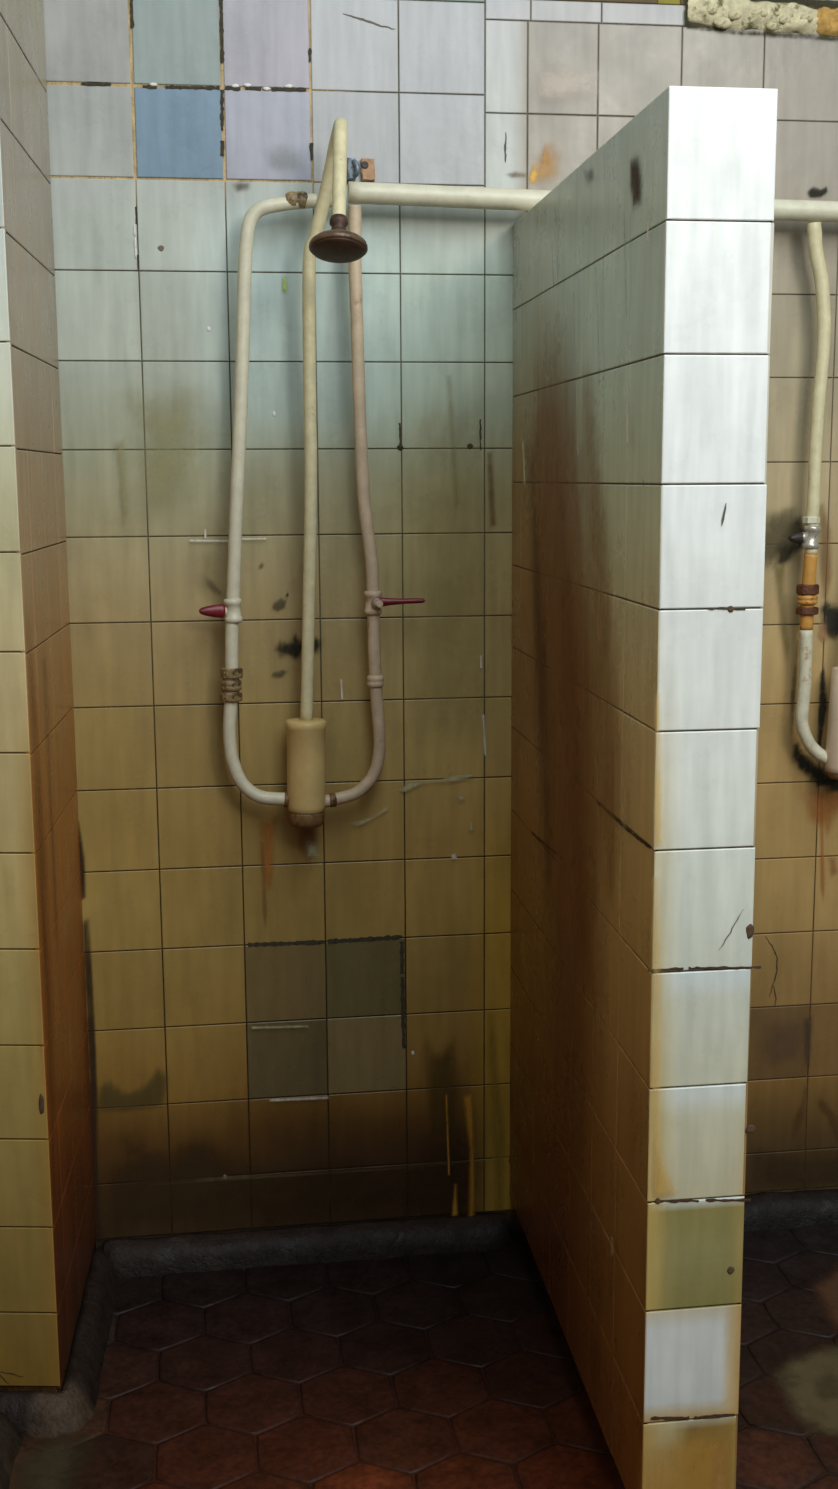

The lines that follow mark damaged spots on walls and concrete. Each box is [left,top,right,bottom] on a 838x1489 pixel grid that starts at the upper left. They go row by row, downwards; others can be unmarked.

spalling [684,0,838,40]
rust [511,152,552,182]
water stain [765,512,804,593]
water stain [820,603,838,639]
water stain [273,636,320,676]
water stain [125,1055,474,1216]